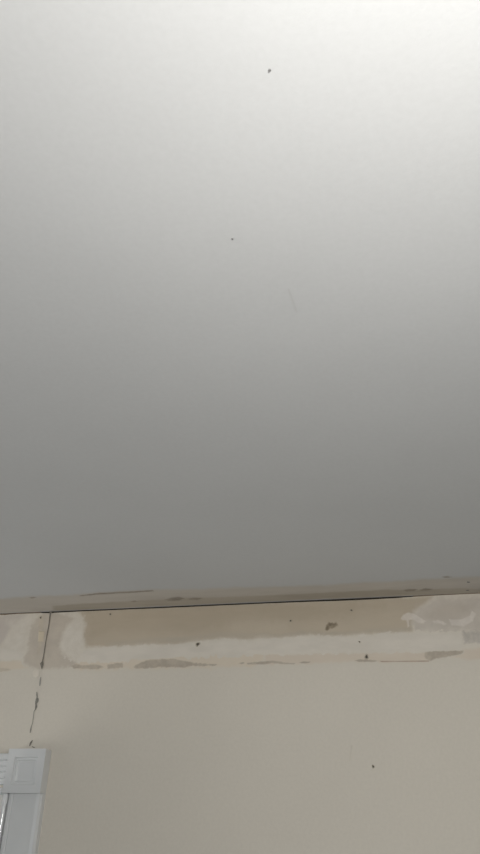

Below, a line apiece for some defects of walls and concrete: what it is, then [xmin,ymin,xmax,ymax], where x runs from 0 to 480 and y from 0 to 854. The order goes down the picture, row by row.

crack [0,593,480,748]